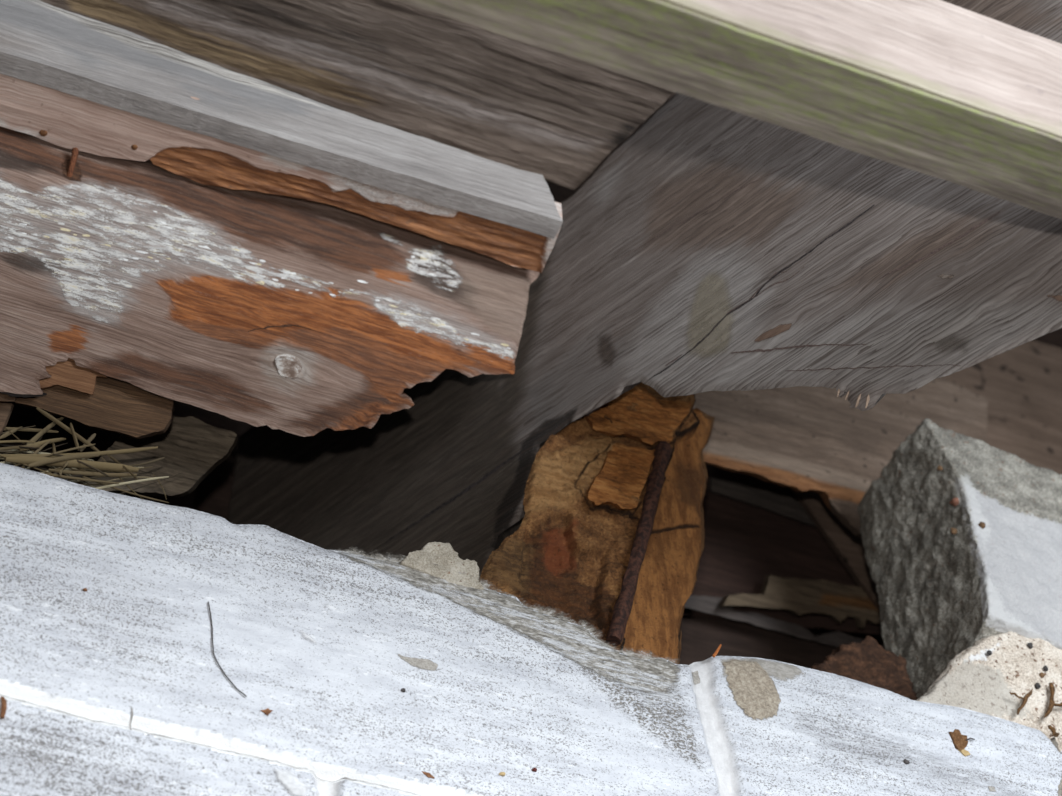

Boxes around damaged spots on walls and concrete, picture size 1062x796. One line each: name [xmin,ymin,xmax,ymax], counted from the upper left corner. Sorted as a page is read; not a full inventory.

rust [62,160,82,181]
peeling [0,178,514,358]
crack [0,694,421,796]
crack [1050,737,1062,753]
crack [1054,779,1062,796]